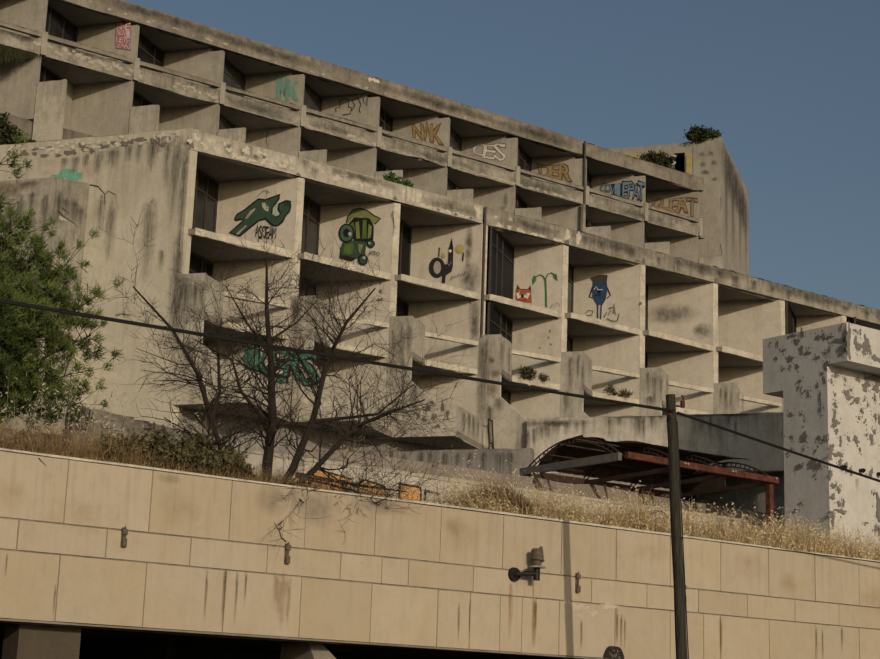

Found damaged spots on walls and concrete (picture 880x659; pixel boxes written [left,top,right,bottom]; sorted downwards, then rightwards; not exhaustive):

peeling [33,41,142,79]
peeling [3,130,301,176]
peeling [51,169,83,182]
peeling [416,401,449,428]
peeling [768,322,880,528]
peeling [864,492,880,536]